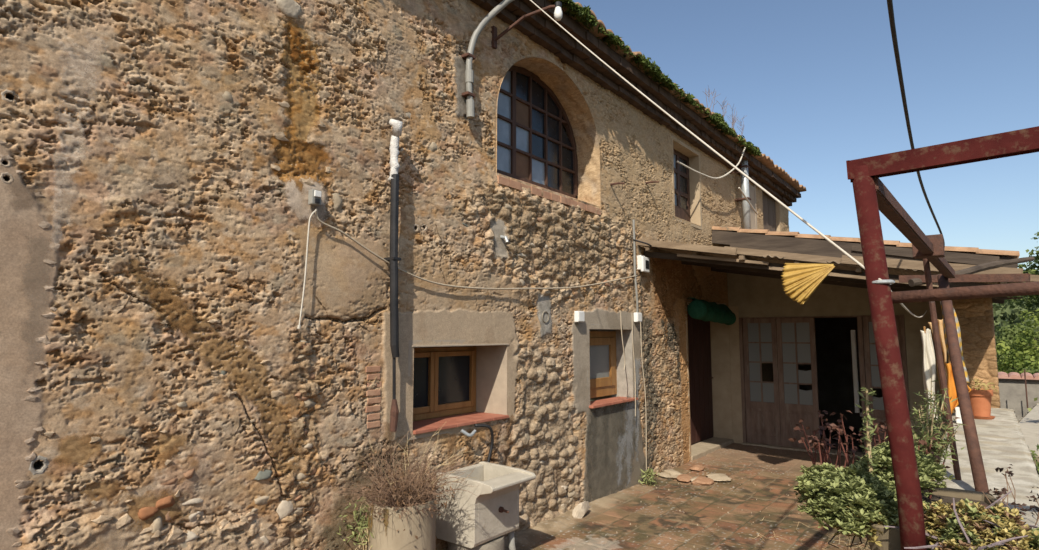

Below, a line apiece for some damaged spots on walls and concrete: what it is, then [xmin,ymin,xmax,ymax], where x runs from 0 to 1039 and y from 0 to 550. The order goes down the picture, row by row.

crack [304,296,385,332]
damp [583,270,681,502]